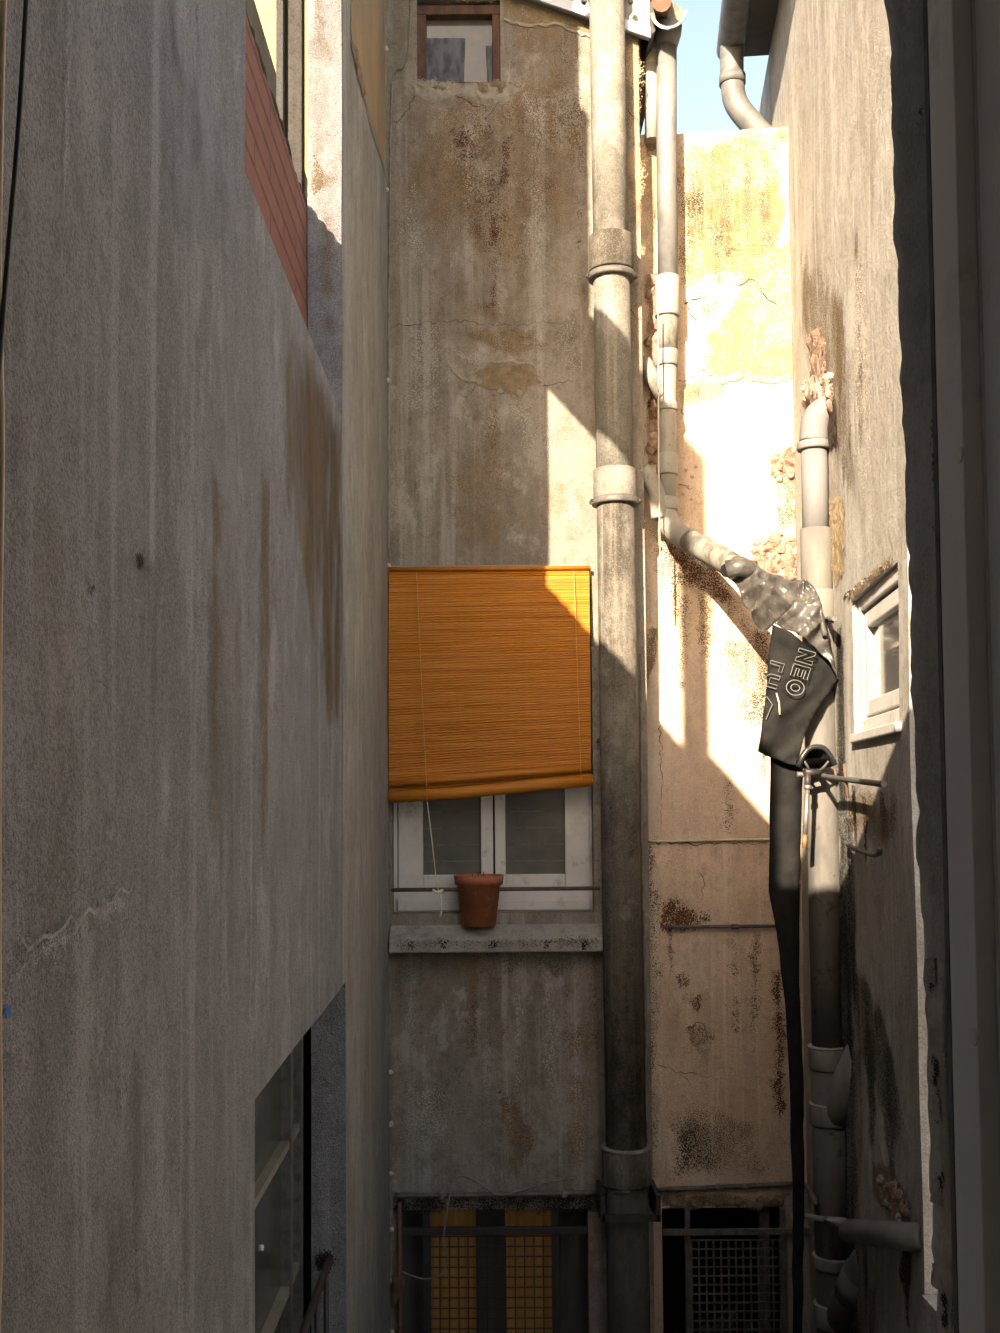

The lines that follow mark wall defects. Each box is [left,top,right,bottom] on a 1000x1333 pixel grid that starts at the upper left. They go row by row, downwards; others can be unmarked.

damp [61,0,205,1333]
damp [192,353,272,1005]
damp [283,305,346,724]
damp [394,21,592,549]
spalling [625,41,658,365]
spalling [644,386,658,465]
damp [677,168,741,271]
damp [649,523,771,730]
peeling [677,121,838,453]
spalling [768,444,795,530]
damp [835,622,906,1219]
damp [669,1106,777,1182]